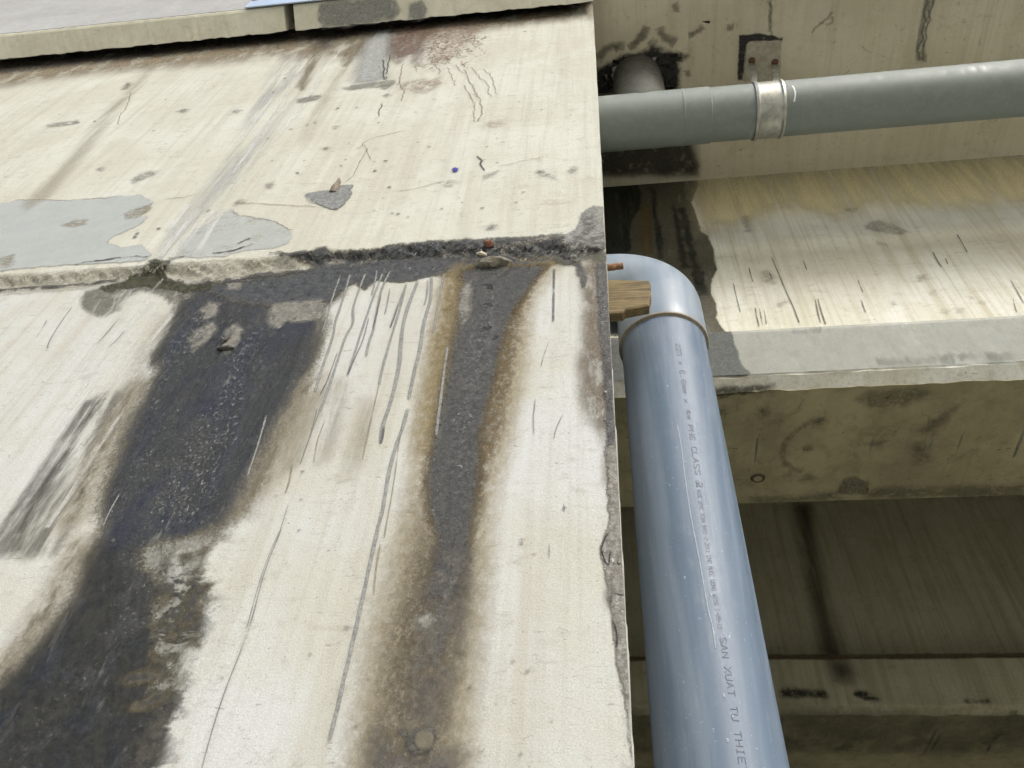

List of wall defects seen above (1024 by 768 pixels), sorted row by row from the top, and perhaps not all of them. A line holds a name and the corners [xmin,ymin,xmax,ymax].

crack [348,55,496,180]
peeling [0,195,153,271]
peeling [176,210,292,257]
leakage [0,234,580,768]